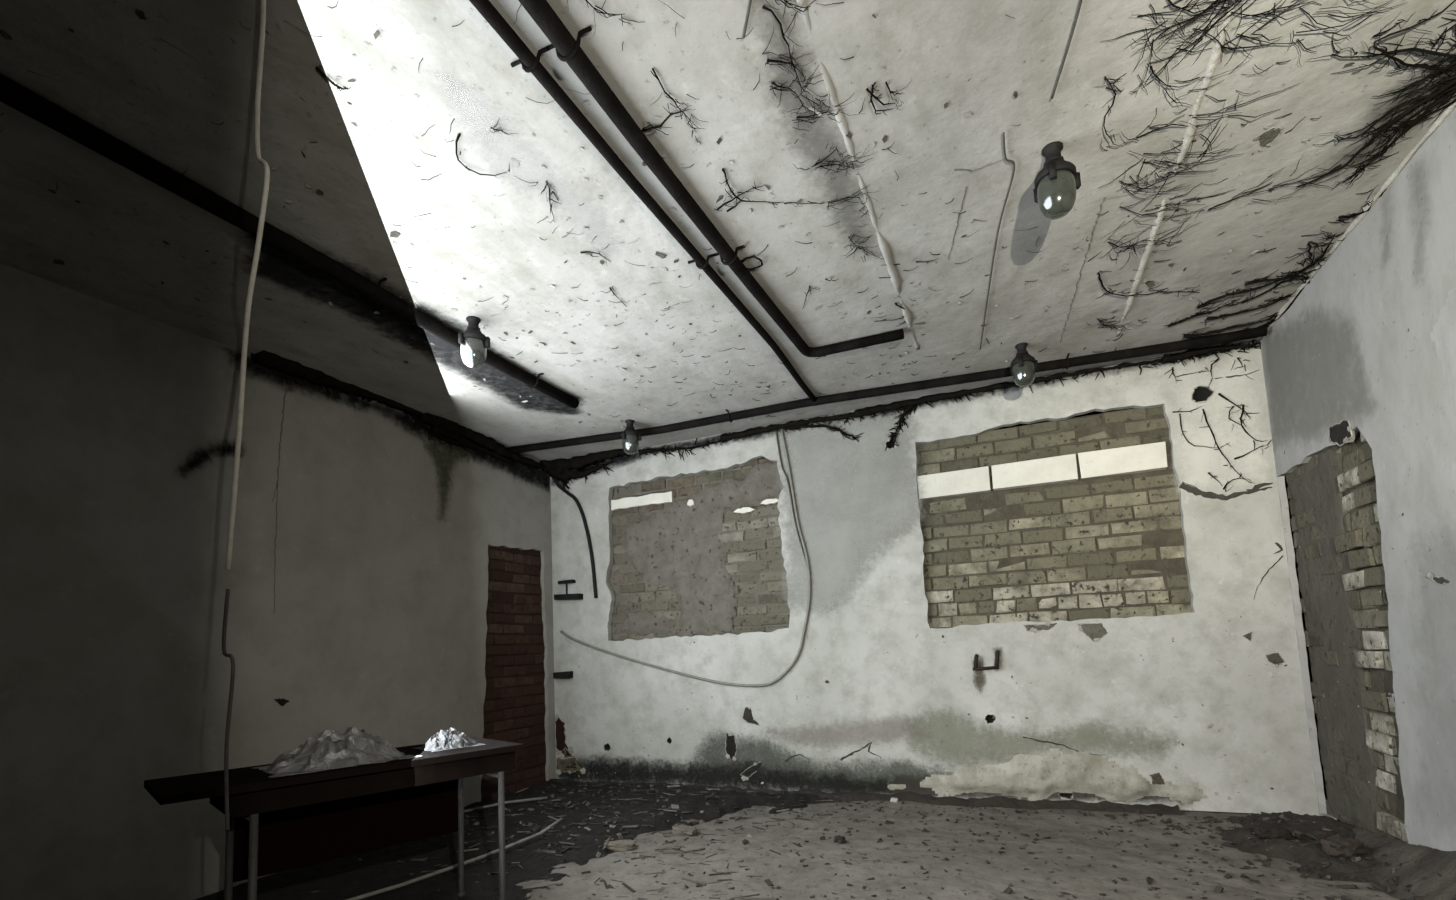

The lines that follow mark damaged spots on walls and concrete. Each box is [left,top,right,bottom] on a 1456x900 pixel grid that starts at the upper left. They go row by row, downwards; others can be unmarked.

crack [1179,482,1273,500]
damp [558,733,1028,800]
damp [1047,792,1105,801]